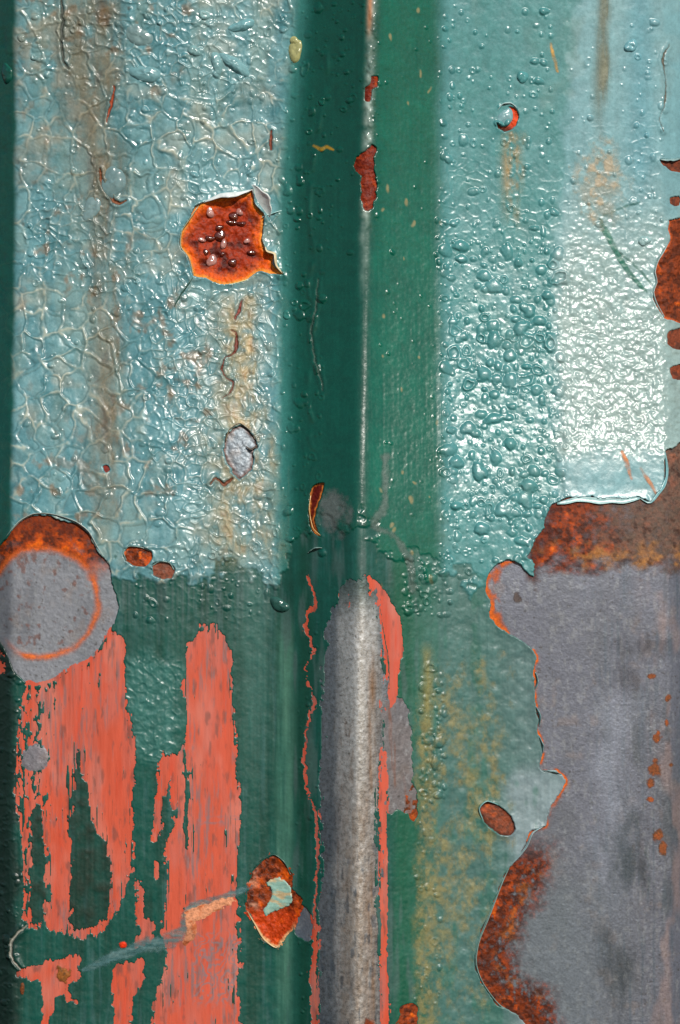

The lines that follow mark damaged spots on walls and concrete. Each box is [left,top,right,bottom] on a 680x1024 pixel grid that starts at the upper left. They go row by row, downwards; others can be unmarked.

crack [60,0,69,69]
crack [106,86,115,122]
crack [99,169,127,205]
corrosion [174,184,283,306]
corrosion [653,218,680,323]
crack [221,301,242,396]
peeling [0,513,119,683]
peeling [22,744,50,772]
peeling [295,574,418,1024]
peeling [474,443,680,1024]
peeling [181,896,235,946]
corrosion [244,852,304,948]